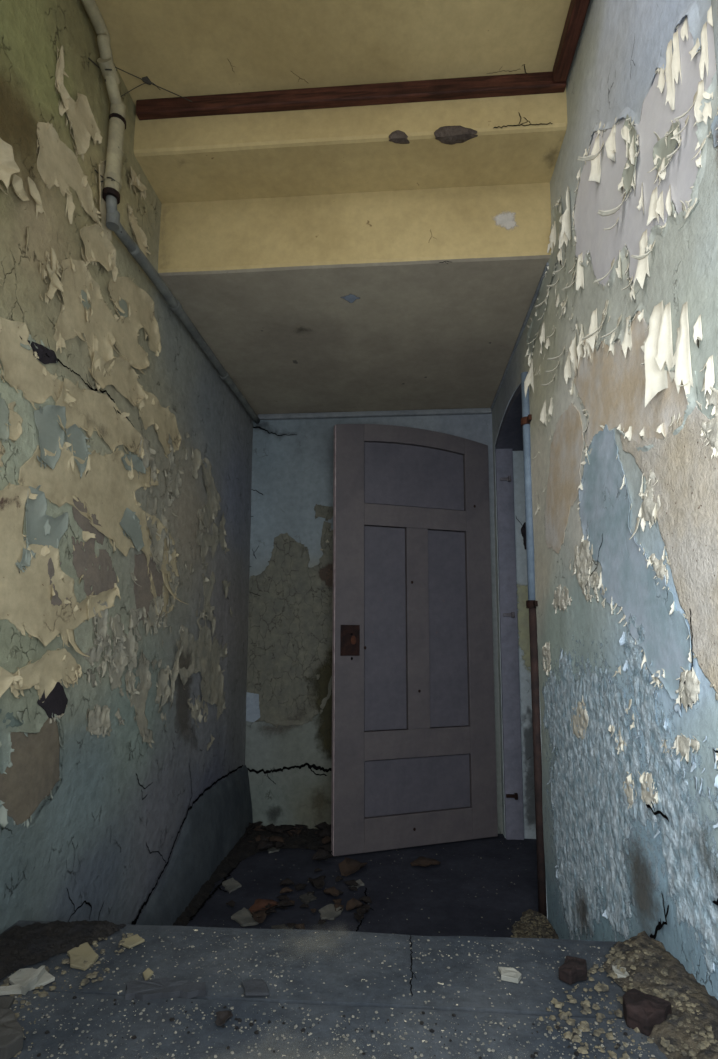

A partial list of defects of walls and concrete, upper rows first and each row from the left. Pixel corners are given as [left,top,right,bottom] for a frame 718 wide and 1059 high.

peeling [519,1,718,717]
peeling [0,46,233,838]
peeling [246,504,333,728]
water stain [311,650,332,759]
spalling [608,699,635,755]
spalling [623,772,659,808]
spalling [661,733,718,800]
crack [131,763,332,925]
crack [67,889,104,922]
crack [650,891,669,939]
crack [408,935,416,996]
spalling [612,965,629,978]